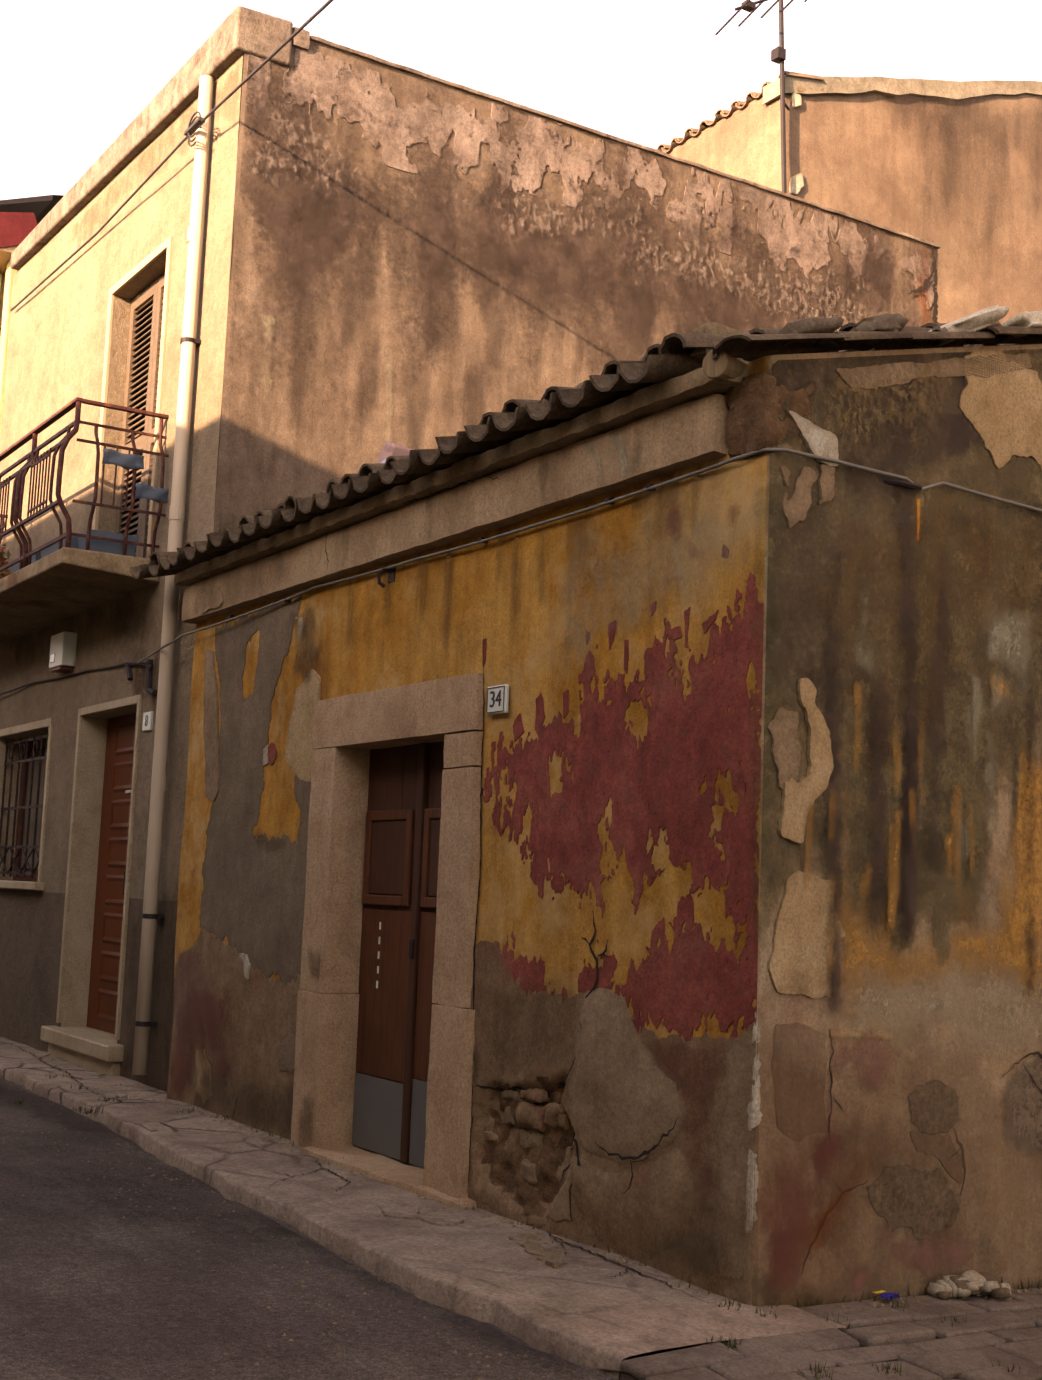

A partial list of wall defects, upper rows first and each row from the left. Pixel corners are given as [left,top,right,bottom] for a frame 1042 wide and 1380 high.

peeling [245,48,886,279]
leakage [240,62,918,363]
peeling [901,251,937,310]
crack [907,241,939,323]
peeling [836,305,1042,473]
peeling [263,743,277,766]
crack [473,645,485,1010]
peeling [467,571,845,1303]
leakage [761,349,1042,1045]
crack [266,1159,351,1192]
crack [468,910,708,1303]
crack [1001,1051,1042,1093]